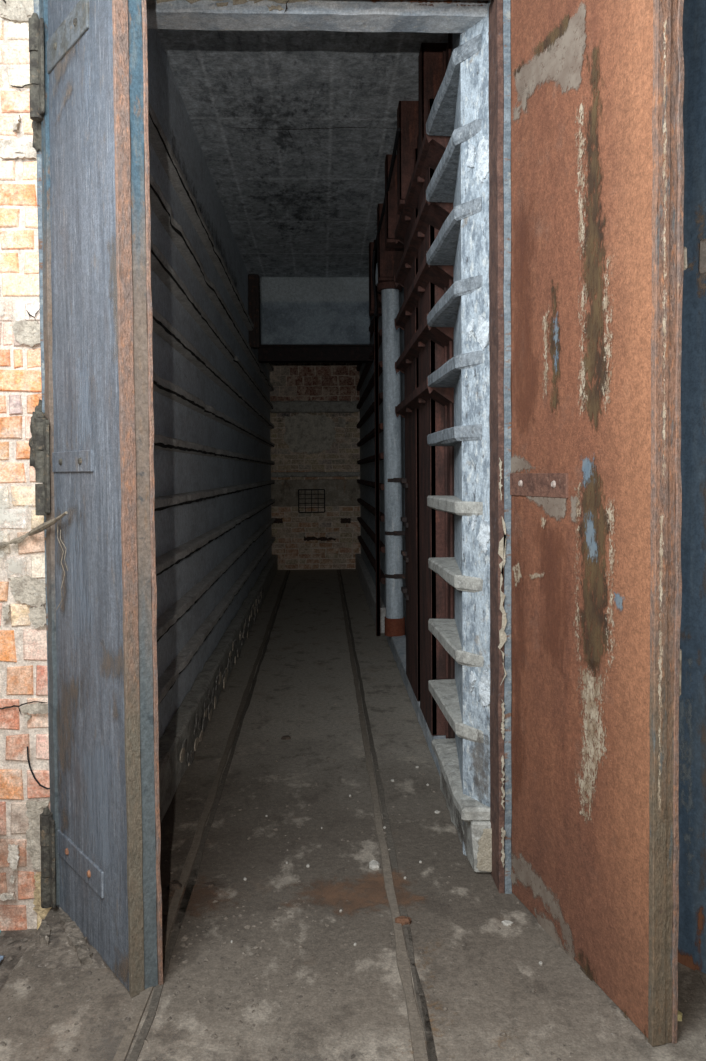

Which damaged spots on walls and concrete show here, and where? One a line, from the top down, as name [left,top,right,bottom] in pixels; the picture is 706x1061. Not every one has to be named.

flaking render [1,575,46,628]